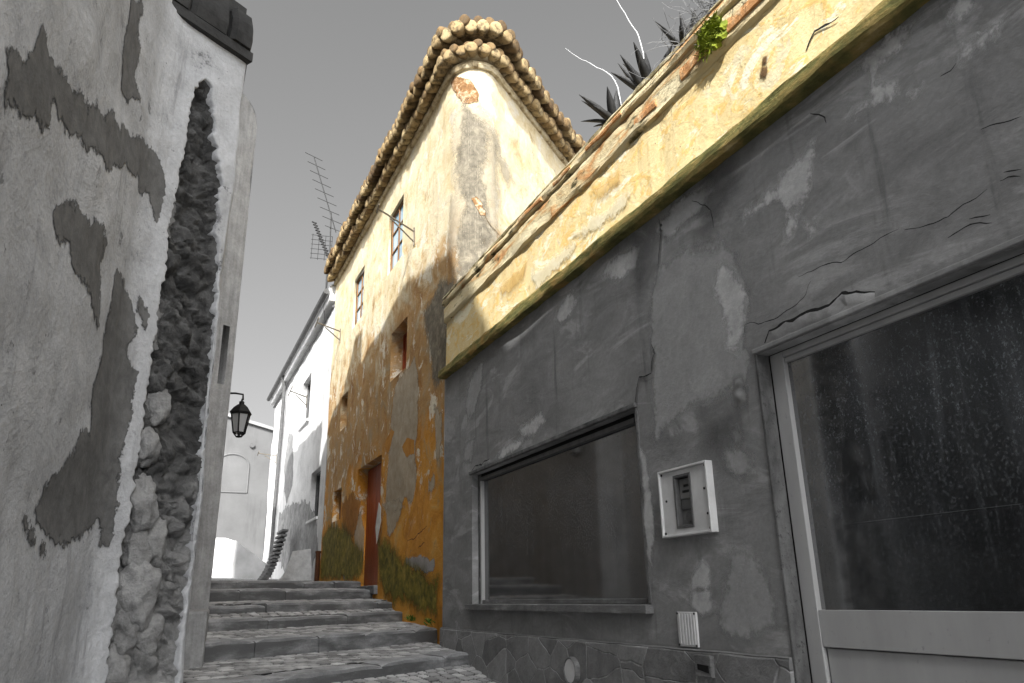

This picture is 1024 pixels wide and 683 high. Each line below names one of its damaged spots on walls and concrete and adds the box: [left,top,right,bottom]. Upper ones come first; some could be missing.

peeling [121,0,144,104]
spalling [451,77,479,104]
crack [806,16,839,51]
leakage [424,105,510,386]
crack [744,169,1021,344]
spalling [4,24,231,683]
peeling [382,357,435,536]
crack [635,345,658,402]